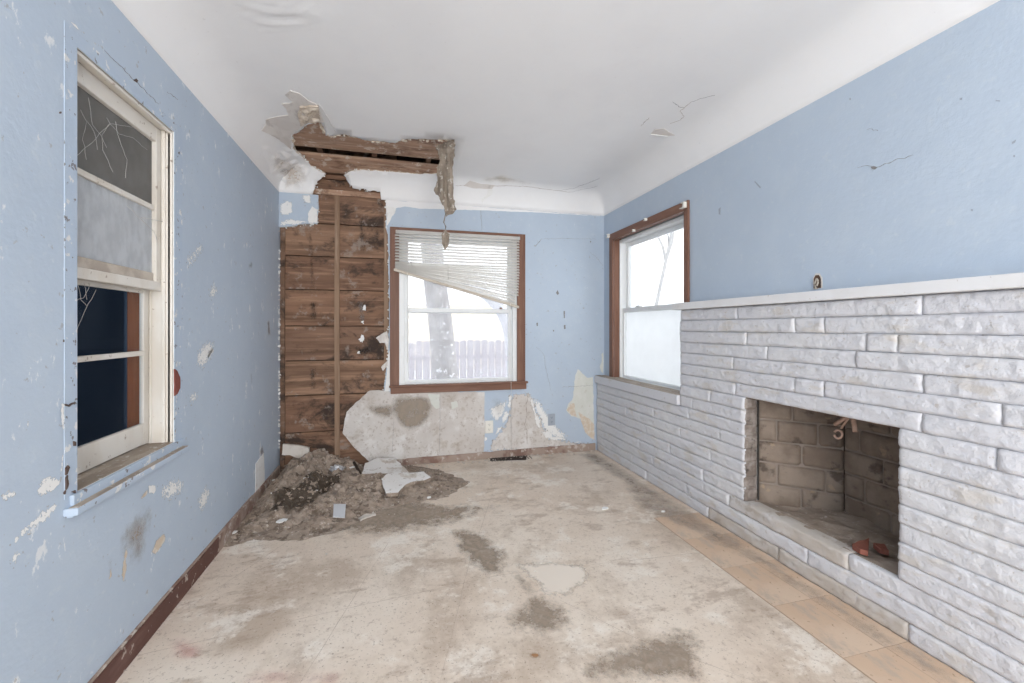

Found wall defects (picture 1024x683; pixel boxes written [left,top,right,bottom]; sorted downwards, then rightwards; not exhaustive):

peeling [261,90,449,232]
water stain [375,399,429,427]
flaking render [342,348,604,462]
peeling [38,455,76,496]
peeling [141,479,184,501]
peeling [10,504,57,564]